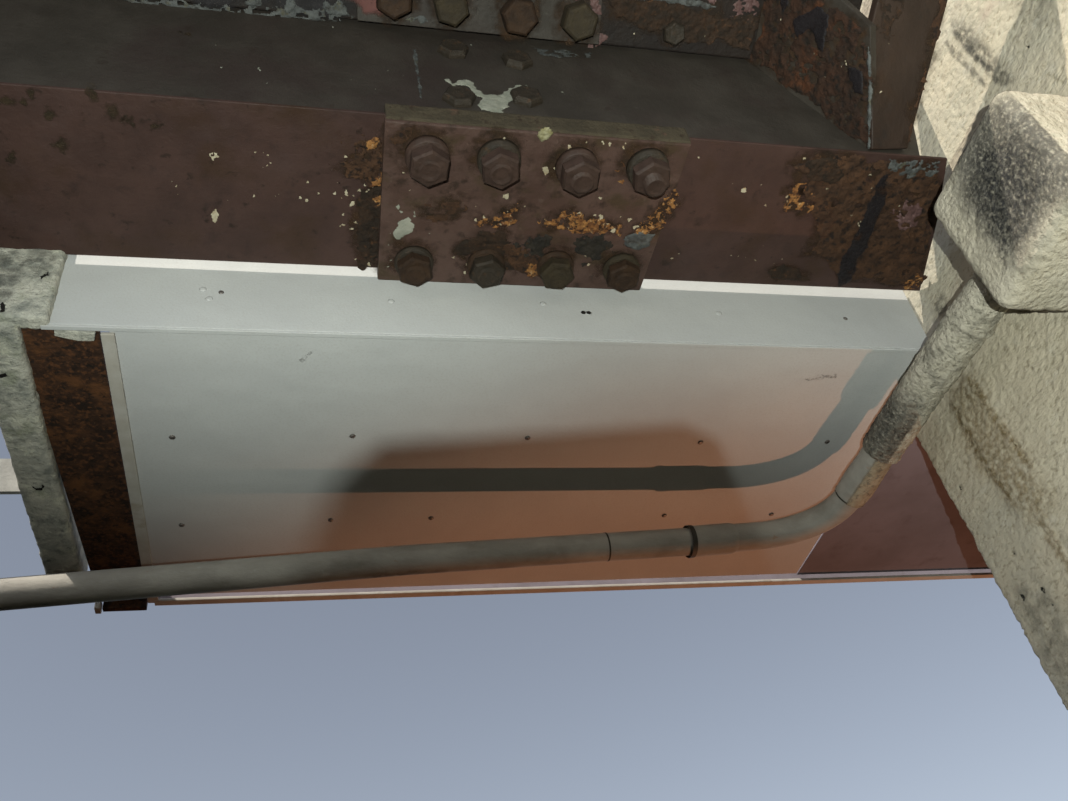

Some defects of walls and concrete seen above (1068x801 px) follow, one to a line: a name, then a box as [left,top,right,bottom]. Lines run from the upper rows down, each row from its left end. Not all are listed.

peeling [126,0,381,28]
peeling [590,0,602,15]
peeling [732,0,759,20]
peeling [444,79,527,113]
rust [747,0,947,290]
rust [329,125,384,271]
rust [419,193,540,278]
rust [538,189,680,237]
damp [975,144,1040,250]